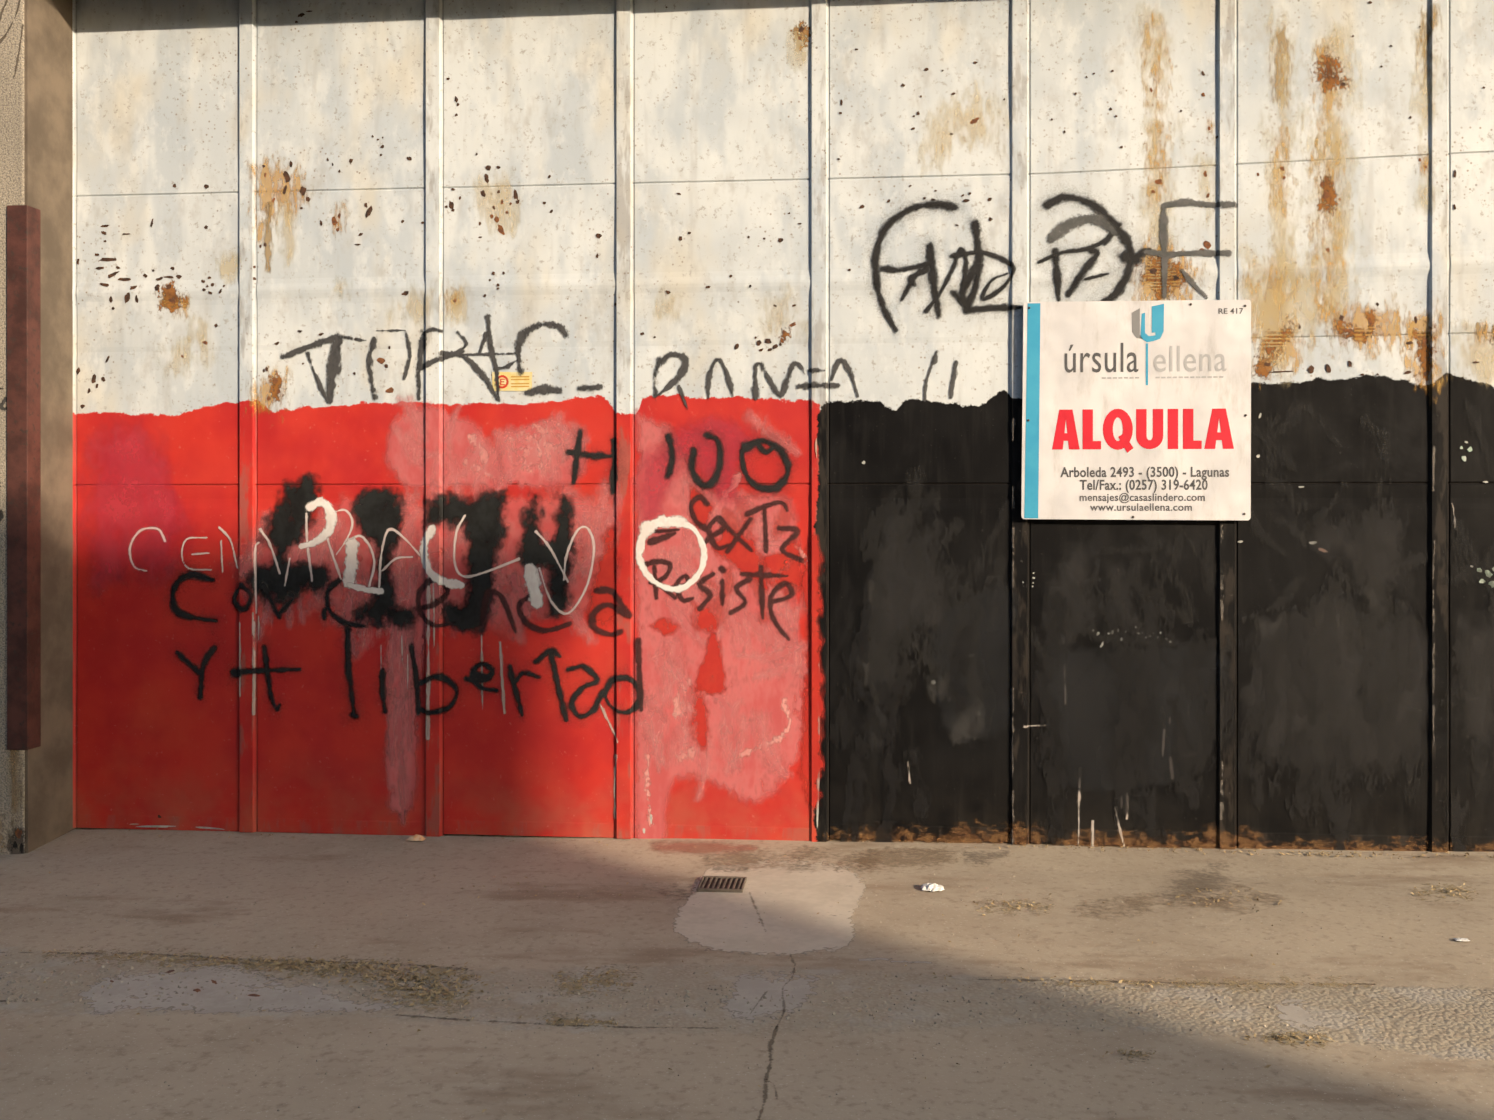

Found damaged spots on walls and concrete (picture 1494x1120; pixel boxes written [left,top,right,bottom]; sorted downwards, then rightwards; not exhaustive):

rust [1275,28,1289,100]
rust [251,160,310,280]
rust [478,178,519,238]
rust [1147,123,1166,200]
rust [1257,142,1288,214]
rust [1311,47,1349,289]
rust [158,280,189,313]
rust [1248,265,1302,378]
rust [1321,302,1442,386]
rust [1476,323,1494,342]
rust [252,369,288,409]
crack [758,959,795,1120]